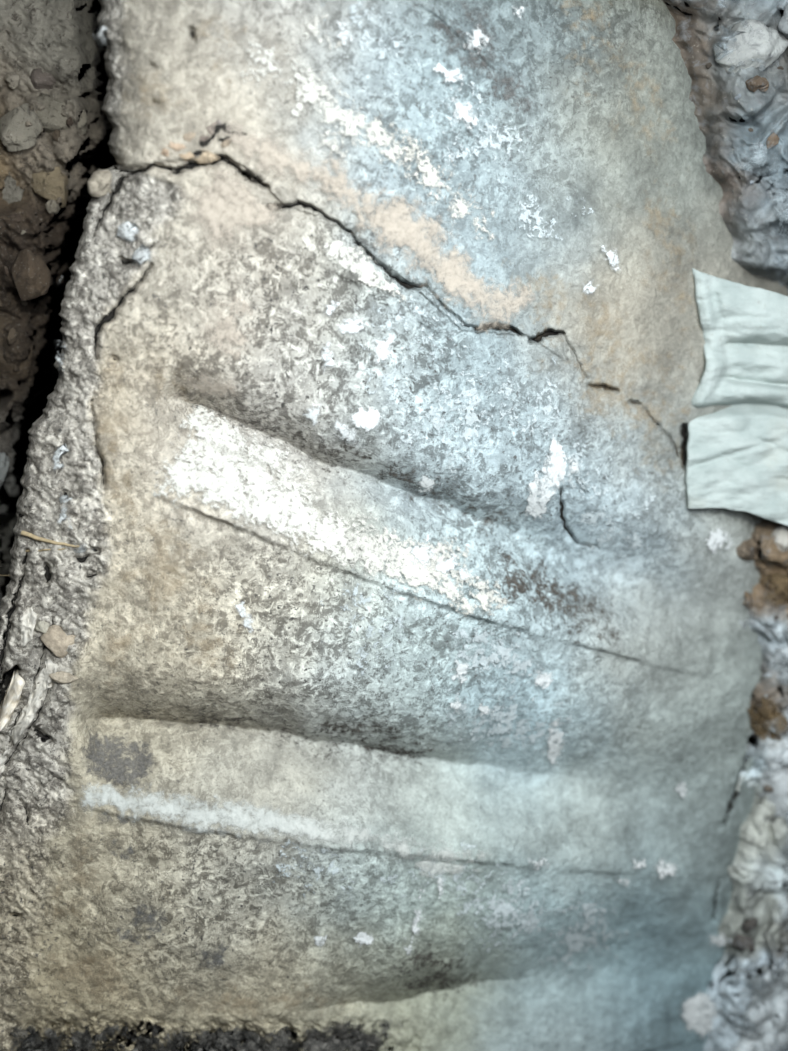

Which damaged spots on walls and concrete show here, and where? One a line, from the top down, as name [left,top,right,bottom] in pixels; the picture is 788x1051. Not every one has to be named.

crack [91,406,104,484]
crack [94,156,678,456]